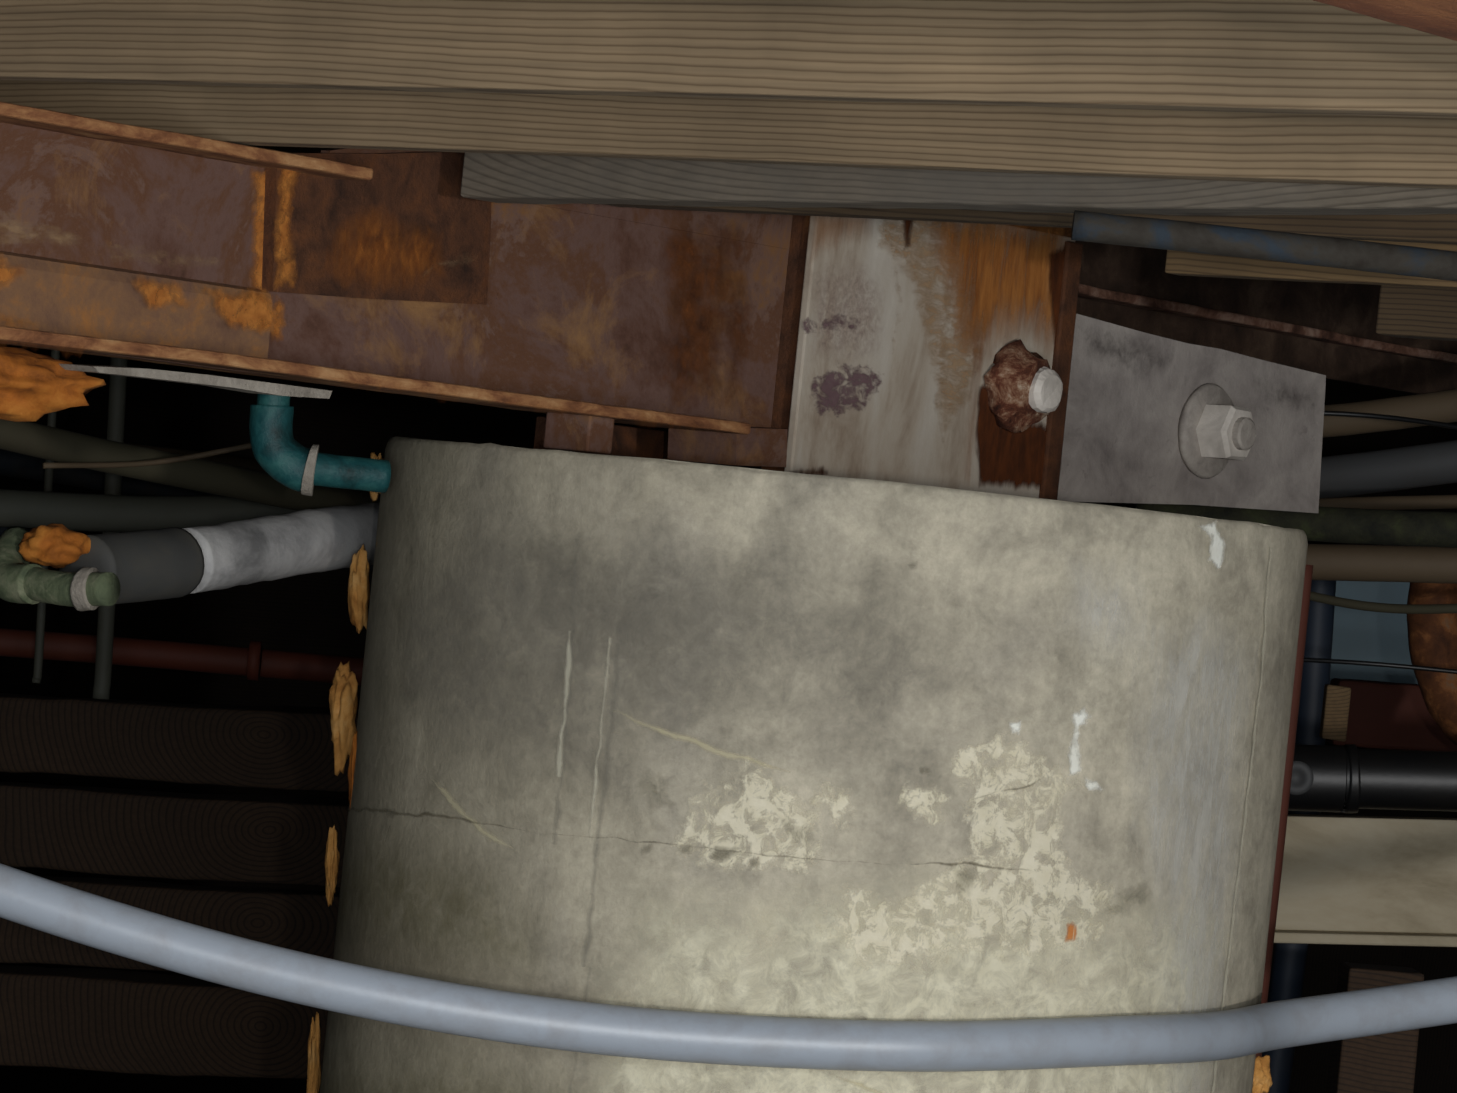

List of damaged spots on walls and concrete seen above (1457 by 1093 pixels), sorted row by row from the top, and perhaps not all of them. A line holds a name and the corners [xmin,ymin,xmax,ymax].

corrosion [137,282,184,307]
corrosion [216,169,296,337]
corrosion [904,220,912,246]
corrosion [943,222,1065,342]
corrosion [977,386,1047,488]
crack [353,808,471,822]